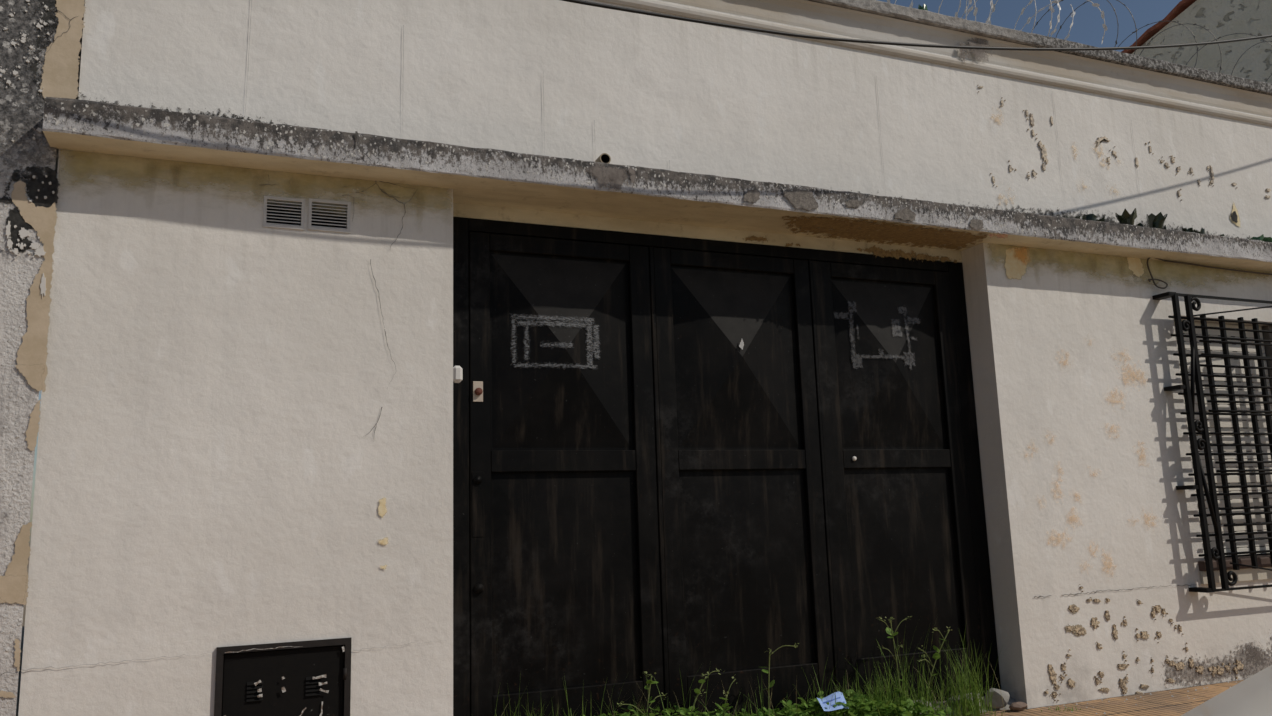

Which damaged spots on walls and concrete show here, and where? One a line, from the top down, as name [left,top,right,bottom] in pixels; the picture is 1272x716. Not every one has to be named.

leakage [28,0,58,100]
peeling [1008,110,1049,179]
peeling [1095,136,1117,166]
peeling [1135,141,1214,186]
spalling [782,189,987,263]
spalling [1230,204,1240,227]
flaking render [11,180,58,453]
crack [342,131,417,437]
flaking render [0,522,32,605]
peeling [1044,649,1076,701]
peeling [1065,584,1184,692]
leakage [1119,637,1272,694]